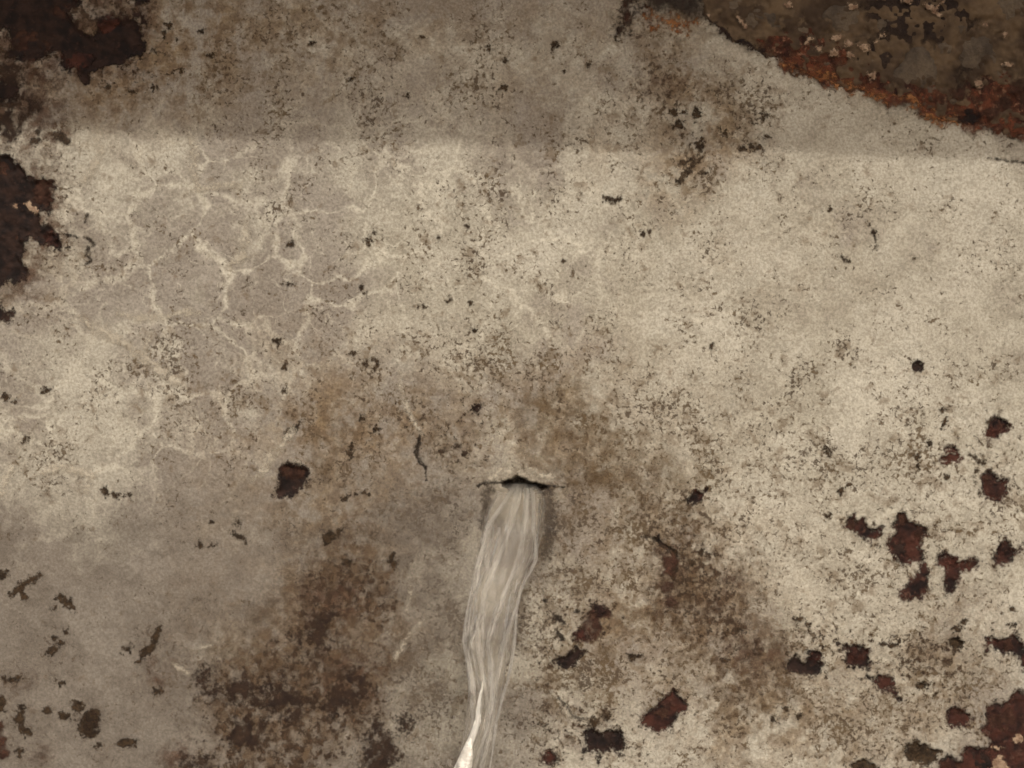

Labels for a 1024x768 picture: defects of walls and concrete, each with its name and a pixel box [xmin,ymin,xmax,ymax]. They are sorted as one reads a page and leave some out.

peeling [0,0,156,103]
peeling [0,153,66,297]
corrosion [976,409,1022,448]
damp [481,485,495,532]
crack [476,479,512,487]
damp [527,482,557,554]
corrosion [974,467,1015,515]
corrosion [840,507,1023,603]
corrosion [836,641,902,702]
corrosion [582,710,628,764]
corrosion [633,682,688,737]
corrosion [896,687,1024,768]